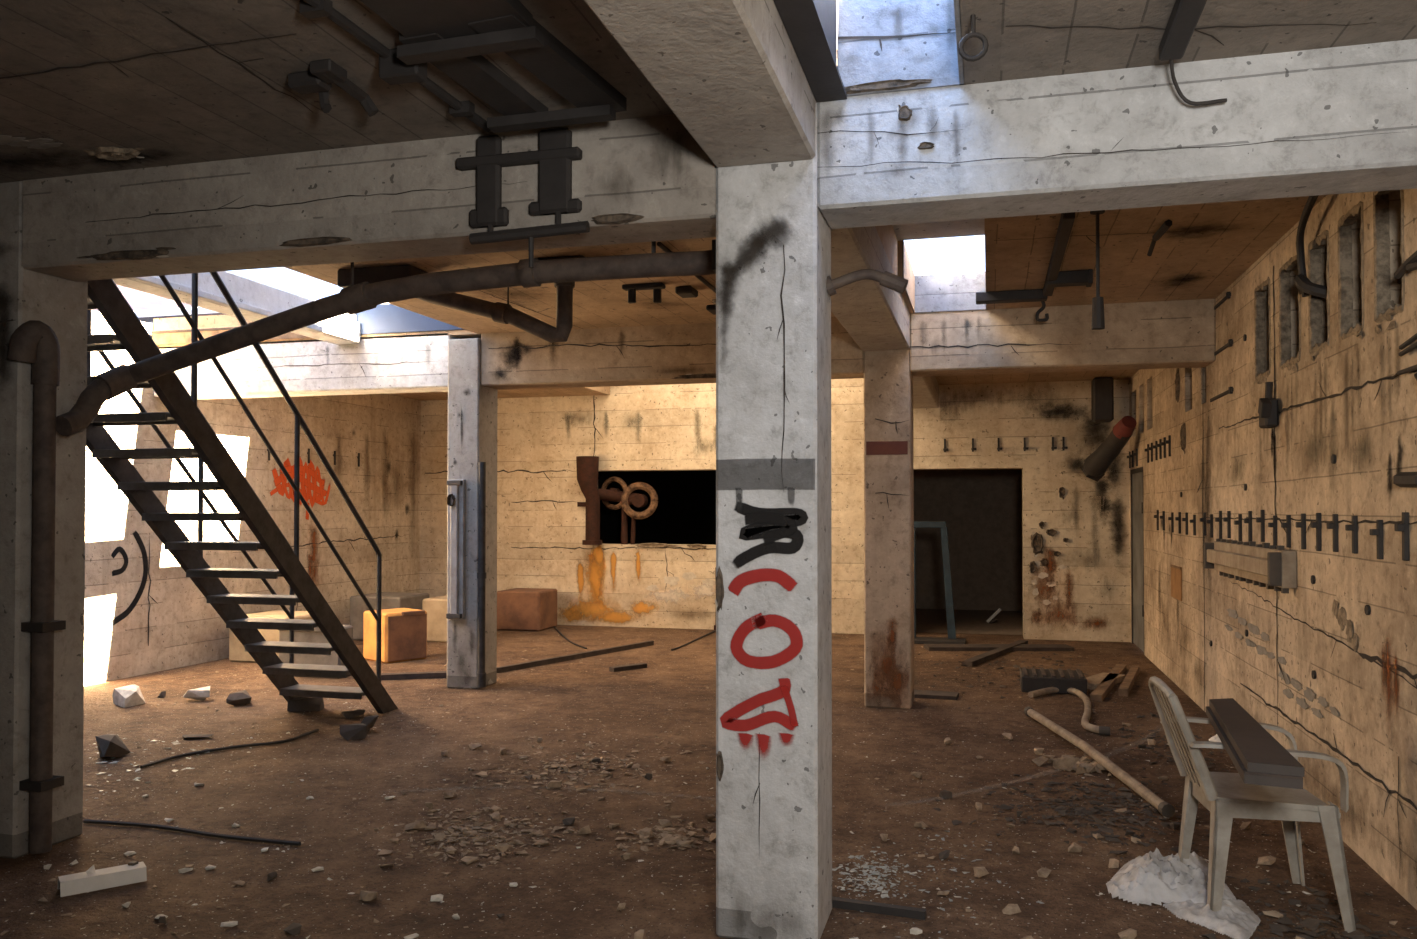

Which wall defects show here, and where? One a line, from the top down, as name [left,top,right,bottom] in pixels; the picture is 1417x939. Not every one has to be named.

rust [562,546,655,624]
spalling [1029,521,1069,605]
crack [1197,266,1417,857]
rust [872,620,909,700]